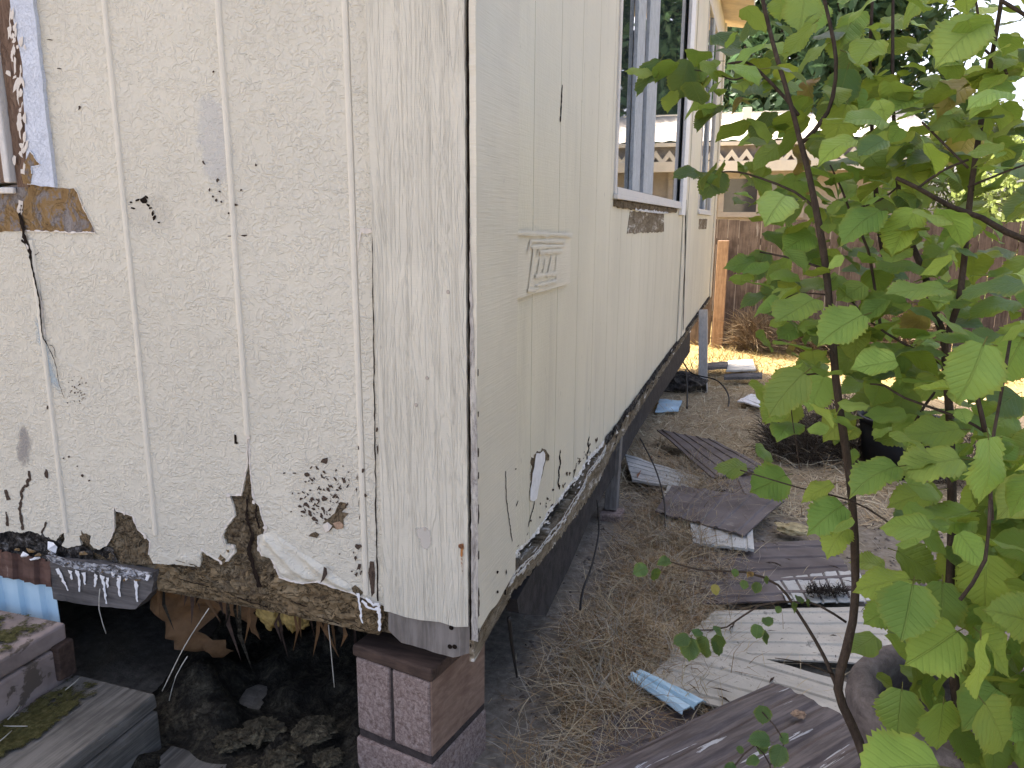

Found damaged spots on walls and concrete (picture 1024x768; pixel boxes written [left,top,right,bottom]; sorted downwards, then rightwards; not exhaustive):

peeling [0,7,96,234]
crack [17,200,64,397]
spalling [102,507,153,566]
spalling [193,435,606,662]